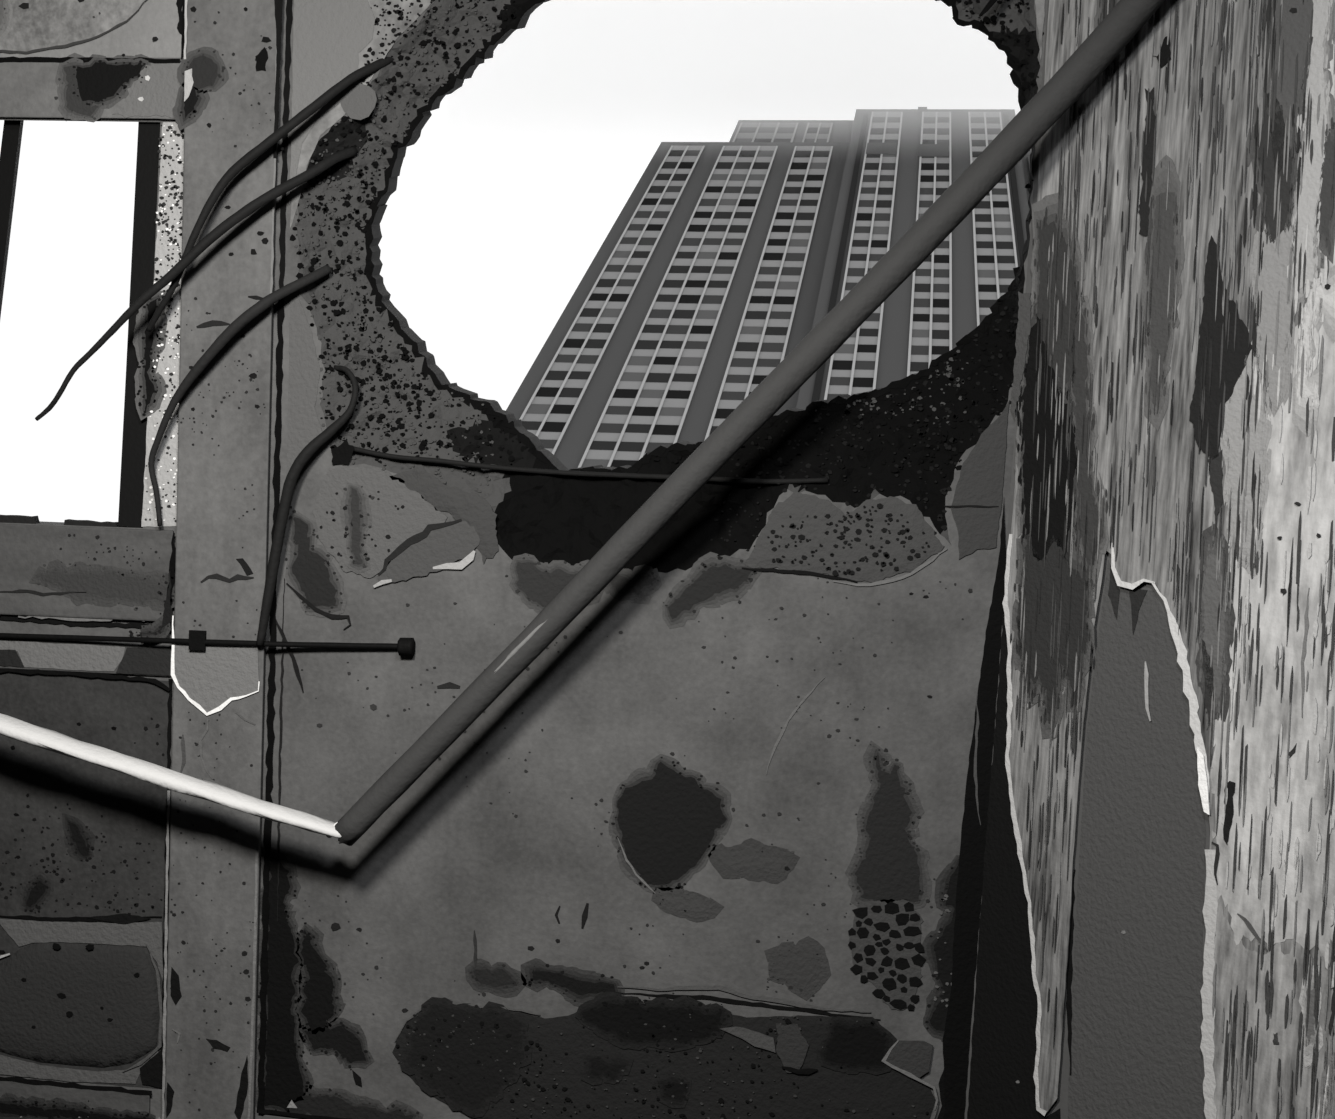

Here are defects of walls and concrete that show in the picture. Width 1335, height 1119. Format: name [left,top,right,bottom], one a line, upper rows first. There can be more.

crack [196,320,230,328]
crack [248,0,293,540]
spalling [287,0,631,585]
crack [378,519,462,576]
leakage [447,407,700,614]
crack [742,567,858,582]
leakage [588,0,1335,1119]
crack [0,533,351,1119]
leakage [255,848,423,1119]
leakage [398,958,733,1118]
crack [555,903,589,929]
crack [617,992,881,1020]